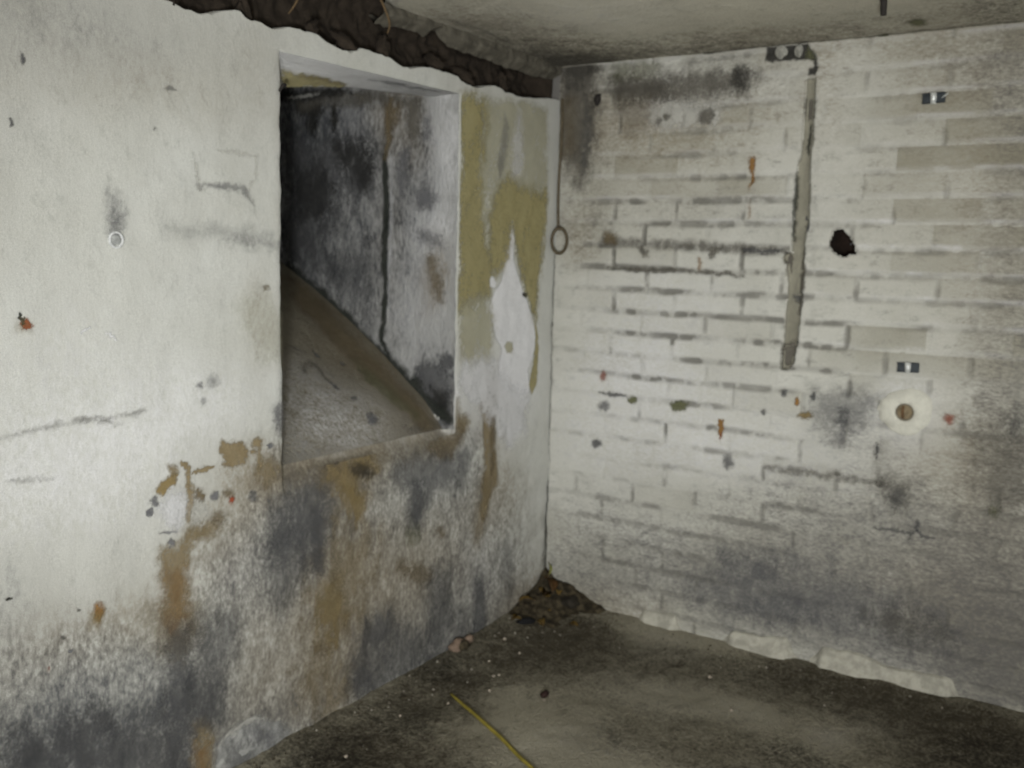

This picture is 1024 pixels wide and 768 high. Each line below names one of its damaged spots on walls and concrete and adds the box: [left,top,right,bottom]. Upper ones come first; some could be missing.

leakage [548,55,616,186]
rust [18,312,32,330]
peeling [168,0,563,447]
leakage [279,71,469,460]
crack [379,81,436,354]
spalling [829,228,857,258]
flaking render [146,436,279,548]
leakage [480,396,498,520]
leakage [0,512,224,768]
leakage [472,575,487,634]